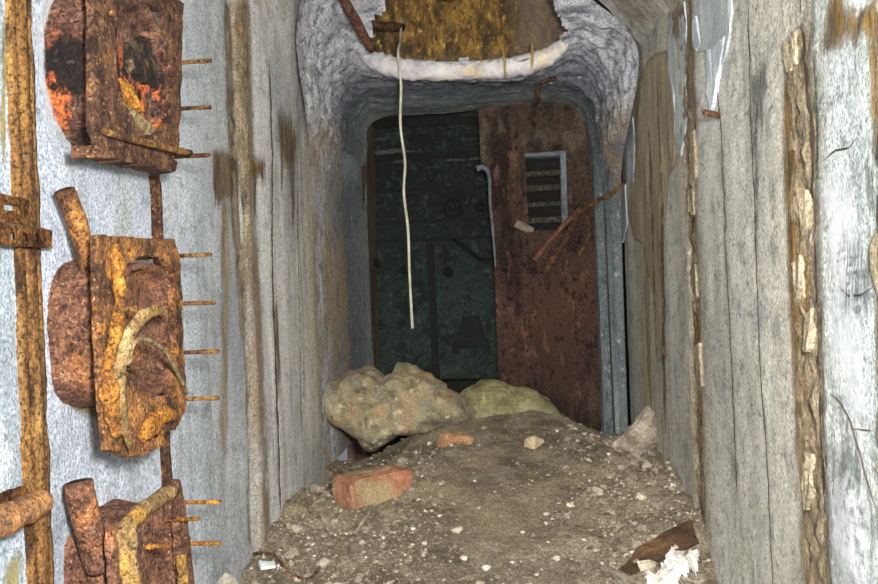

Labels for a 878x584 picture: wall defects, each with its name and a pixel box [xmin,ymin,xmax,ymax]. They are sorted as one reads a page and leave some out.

spalling [370,0,568,62]
peeling [783,30,800,73]
rust [824,0,878,145]
peeling [621,0,734,360]
peeling [793,190,812,236]
peeling [791,255,806,303]
peeling [802,308,818,352]